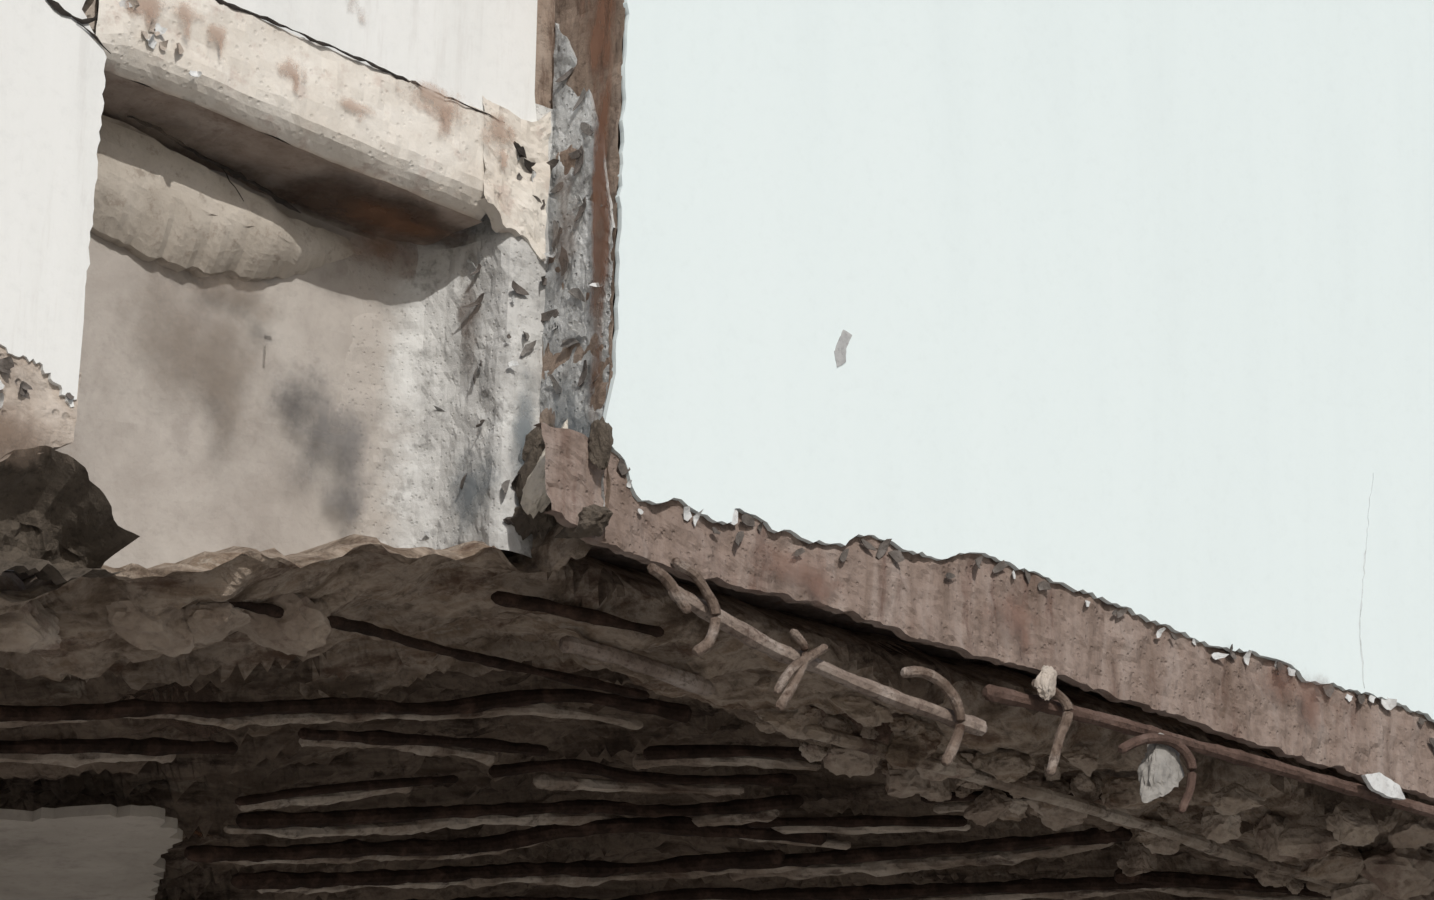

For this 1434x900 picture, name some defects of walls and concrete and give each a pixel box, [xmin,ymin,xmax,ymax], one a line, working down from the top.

crack [47,0,111,54]
rust [583,0,615,388]
spalling [0,346,140,585]
peeling [501,23,1434,819]
spalling [0,591,1341,900]